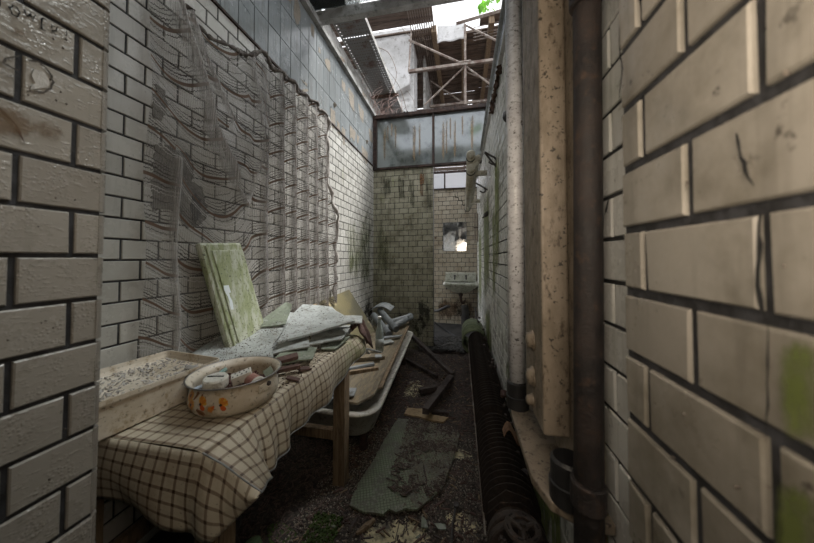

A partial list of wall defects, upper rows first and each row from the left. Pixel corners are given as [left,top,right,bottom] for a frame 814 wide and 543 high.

corrosion [480,64,502,114]
corrosion [442,116,473,158]